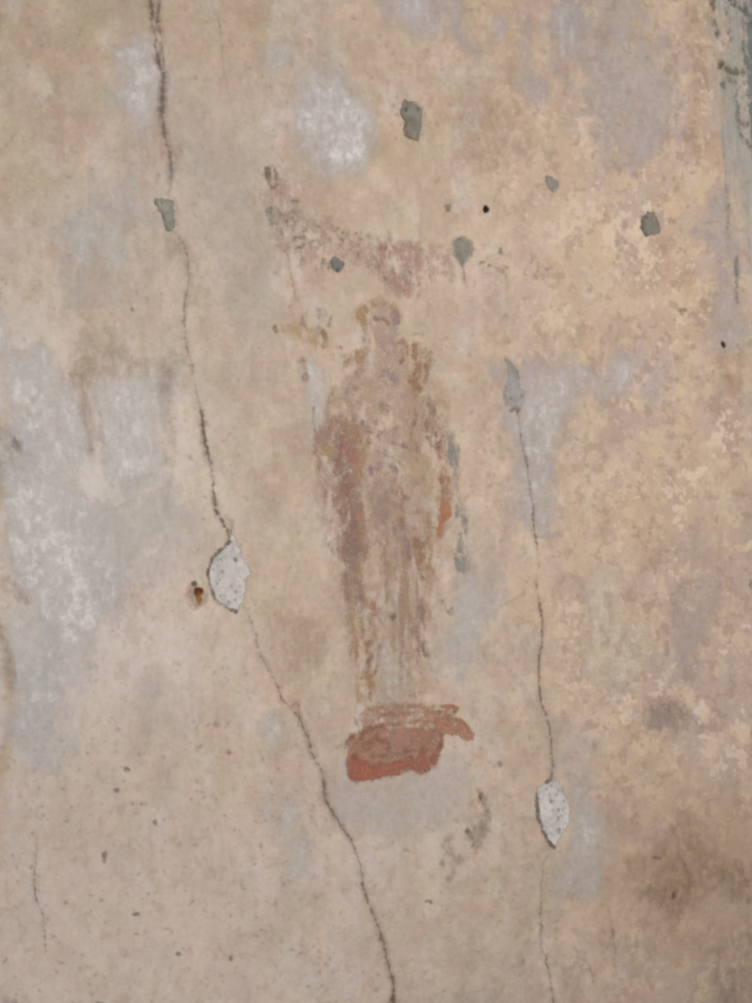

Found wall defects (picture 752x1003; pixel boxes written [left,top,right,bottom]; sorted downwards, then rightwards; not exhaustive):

crack [150,1,165,133]
spalling [400,100,423,141]
spalling [640,212,660,237]
crack [201,411,209,455]
corrosion [189,581,203,603]
crack [362,882,395,1003]